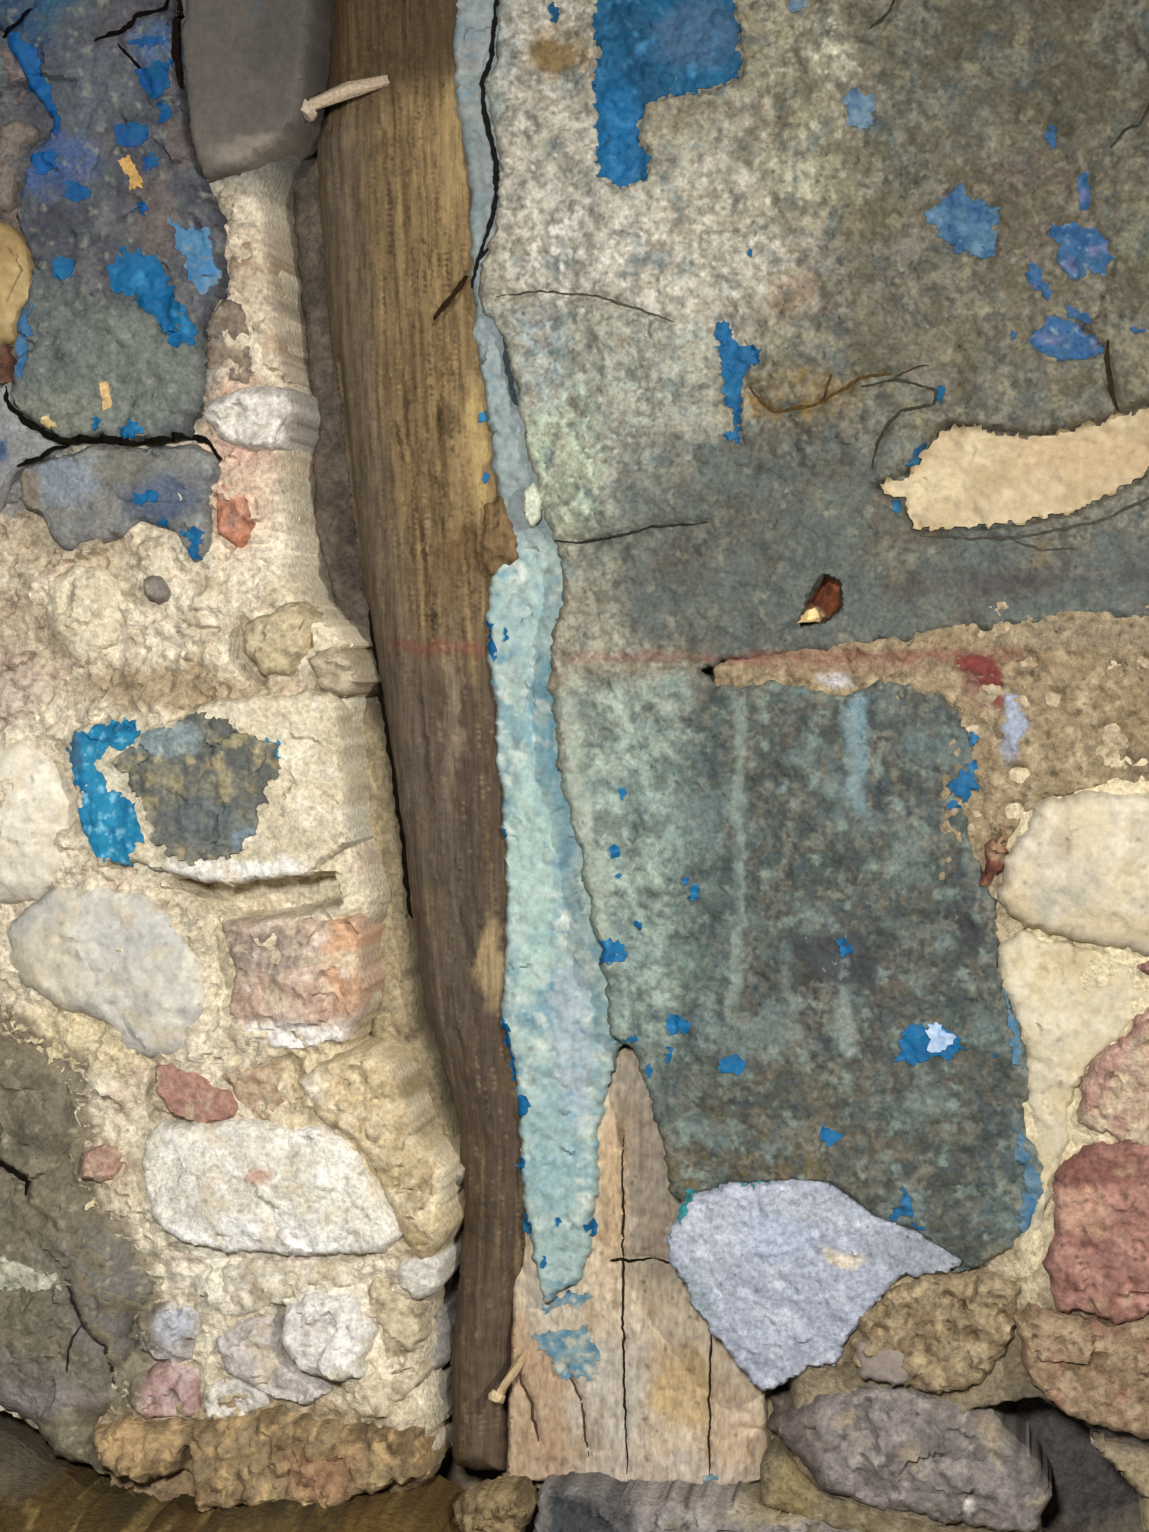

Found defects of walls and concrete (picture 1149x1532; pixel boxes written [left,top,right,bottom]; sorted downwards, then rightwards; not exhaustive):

peeling [7,32,91,203]
peeling [113,34,175,216]
crack [433,0,674,322]
peeling [591,0,743,189]
peeling [106,217,222,348]
crack [3,386,222,467]
crack [502,336,518,405]
spalling [880,408,1149,532]
spalling [797,577,842,624]
peeling [65,711,281,867]
spalling [713,611,1149,880]
crack [0,1160,30,1196]